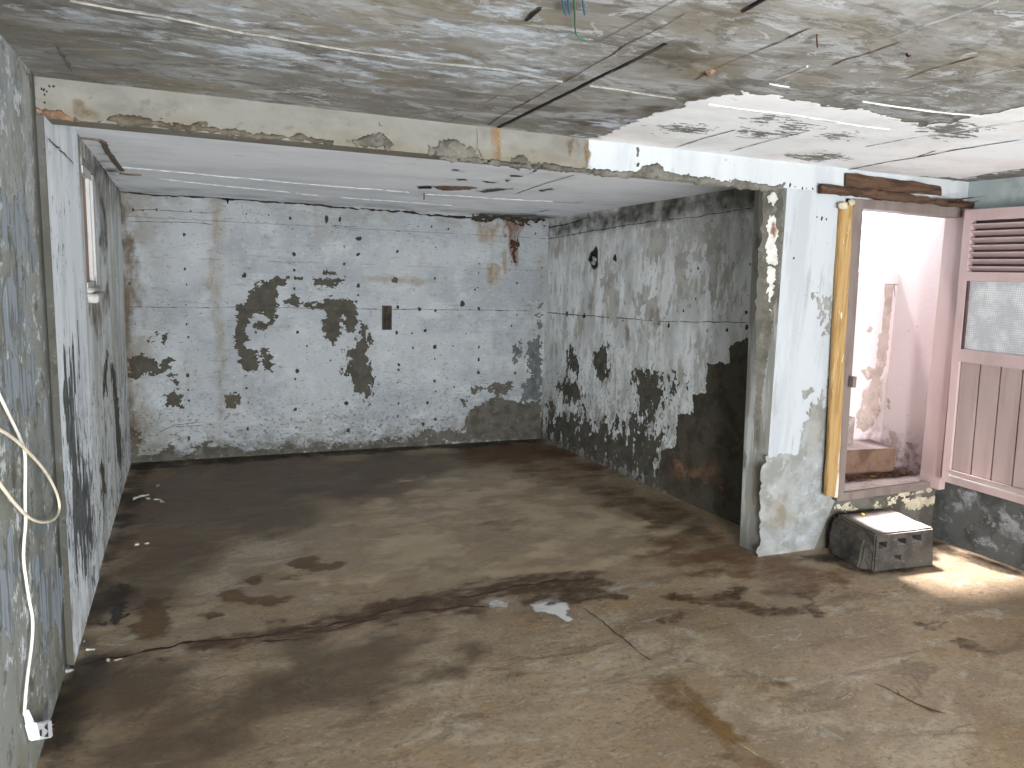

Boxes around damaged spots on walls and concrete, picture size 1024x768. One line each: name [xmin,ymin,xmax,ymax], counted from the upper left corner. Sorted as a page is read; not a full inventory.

spalling [97,114,394,151]
peeling [641,122,720,134]
peeling [735,115,865,162]
water stain [94,161,117,260]
corrosion [492,222,523,265]
peeling [103,139,814,526]
water stain [87,439,705,639]
peeling [756,371,858,557]
peeling [874,487,935,510]
crack [81,577,593,665]
water stain [40,658,185,756]
water stain [107,636,419,768]